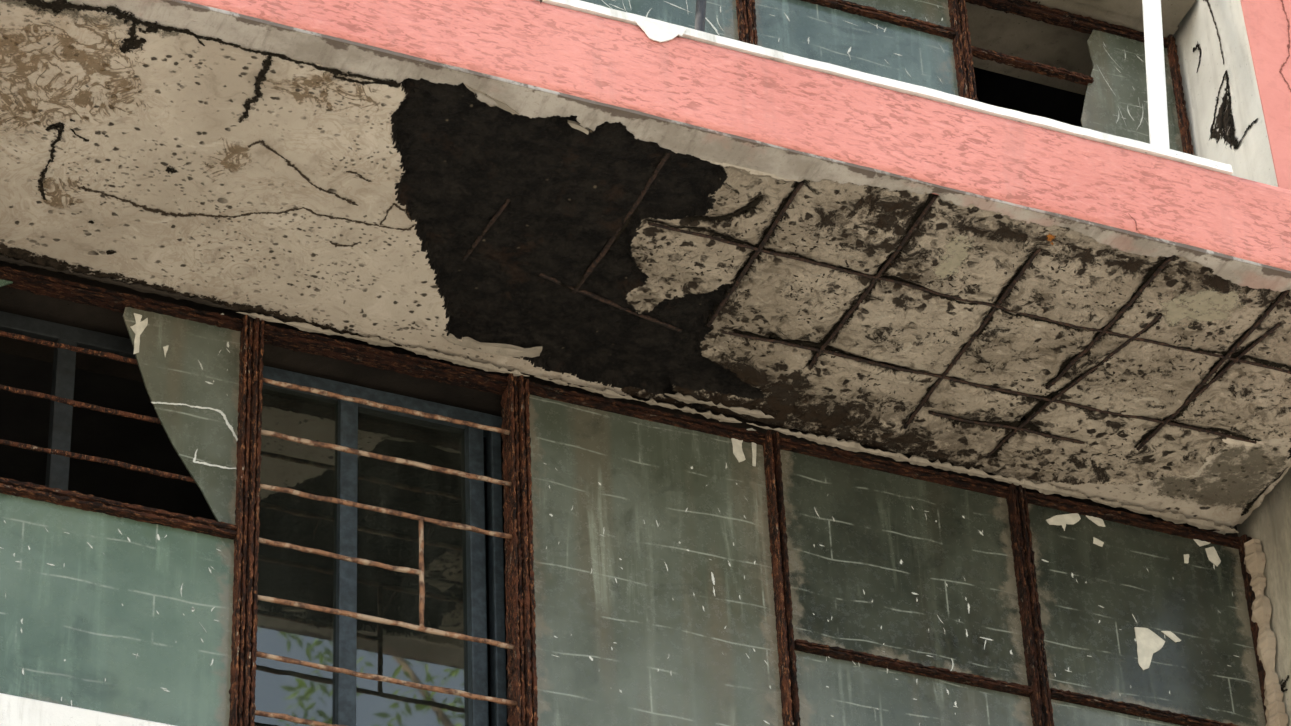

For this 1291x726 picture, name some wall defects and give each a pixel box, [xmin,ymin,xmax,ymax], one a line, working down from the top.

crack [17,0,416,247]
crack [1193,0,1258,151]
crack [1279,0,1291,90]
spalling [390,78,1291,486]